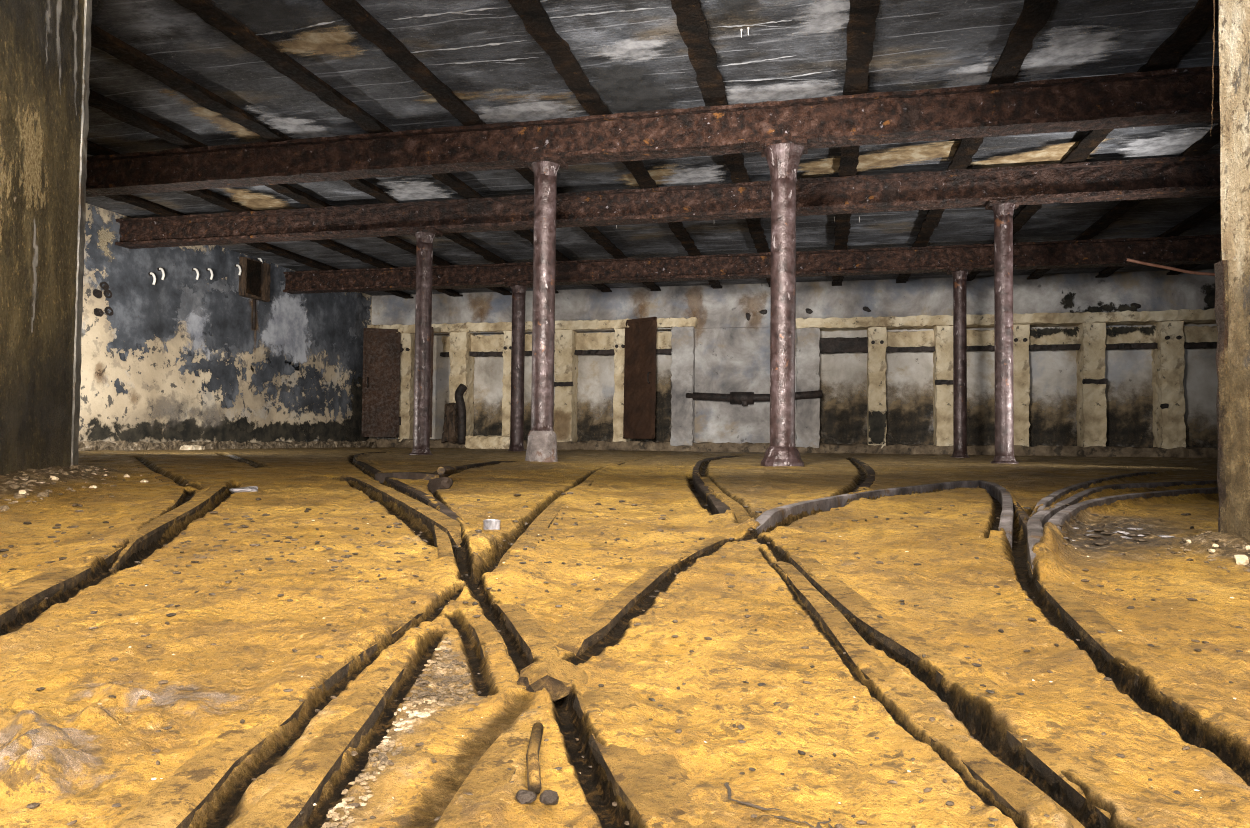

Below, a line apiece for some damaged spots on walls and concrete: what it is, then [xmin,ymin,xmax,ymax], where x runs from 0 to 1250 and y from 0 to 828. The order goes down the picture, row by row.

water stain [790,0,850,35]
water stain [8,0,83,115]
water stain [593,39,665,62]
corrosion [619,164,680,188]
corrosion [797,156,841,179]
corrosion [856,141,960,171]
peeling [83,205,372,424]
water stain [1029,291,1156,338]
water stain [820,381,934,445]
water stain [967,395,995,446]
water stain [1029,395,1077,447]
water stain [1105,386,1154,448]